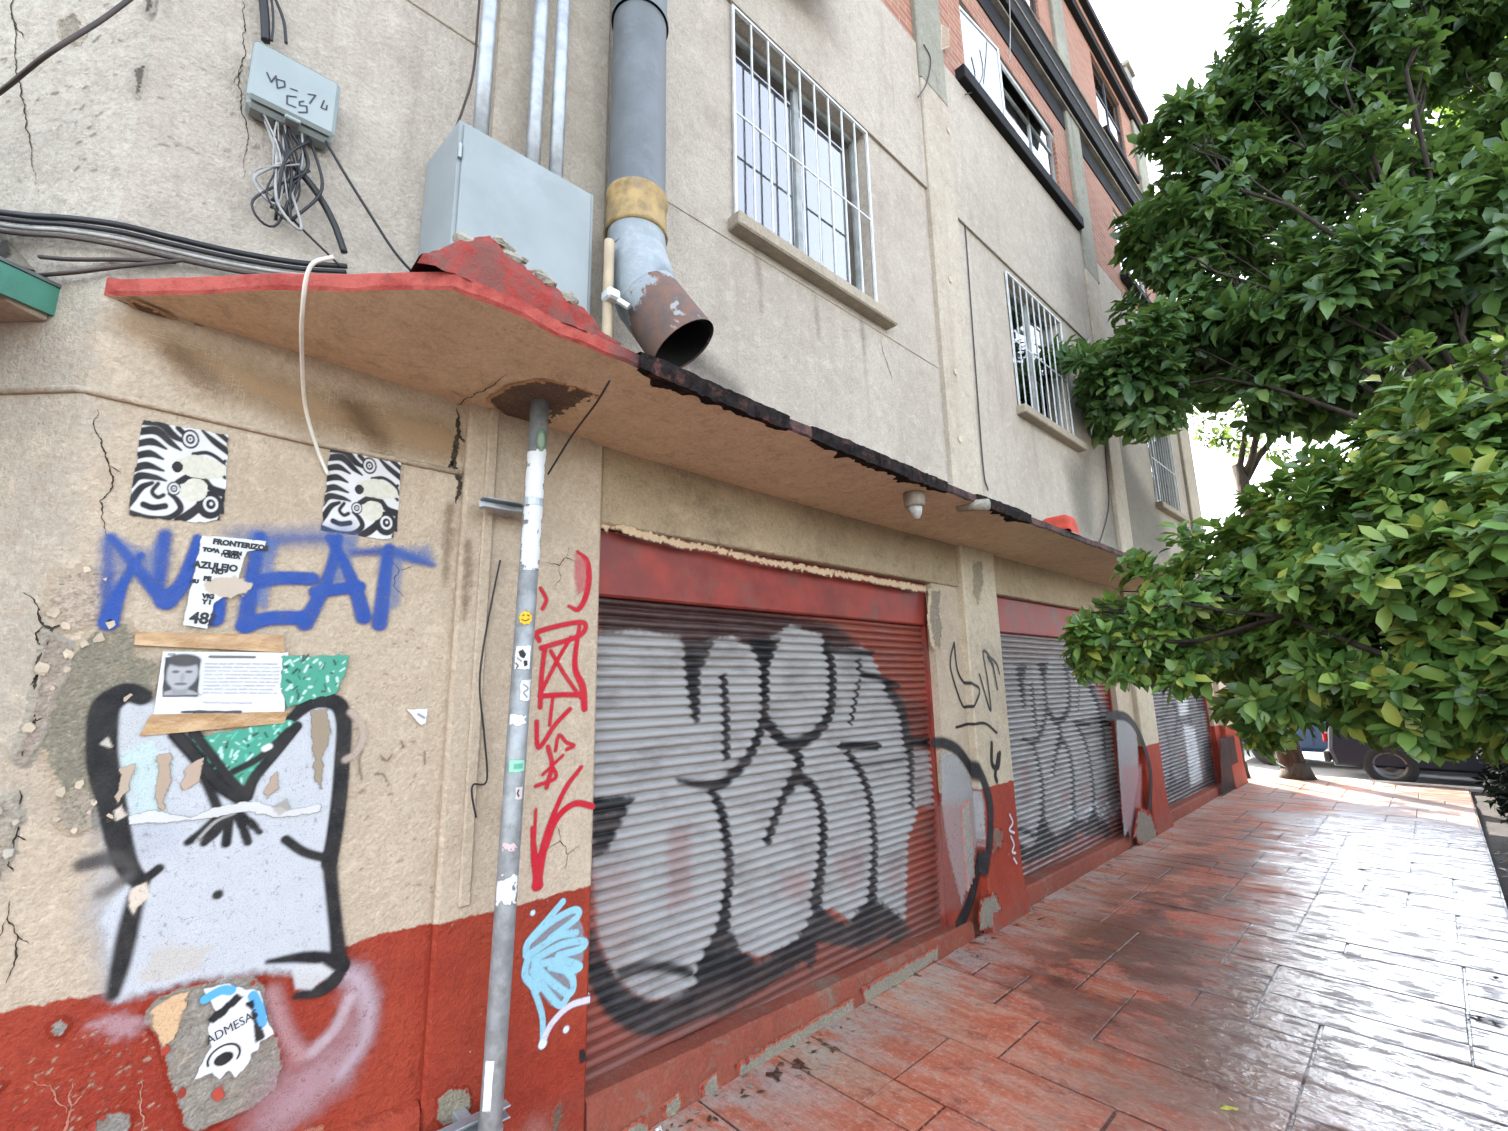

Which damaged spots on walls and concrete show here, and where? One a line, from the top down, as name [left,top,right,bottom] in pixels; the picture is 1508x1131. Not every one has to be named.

crack [10,0,36,178]
spalling [437,231,582,307]
peeling [8,563,161,840]
peeling [0,789,27,878]
spalling [736,945,939,1076]
spalling [434,1085,473,1128]
spalling [622,1071,722,1131]